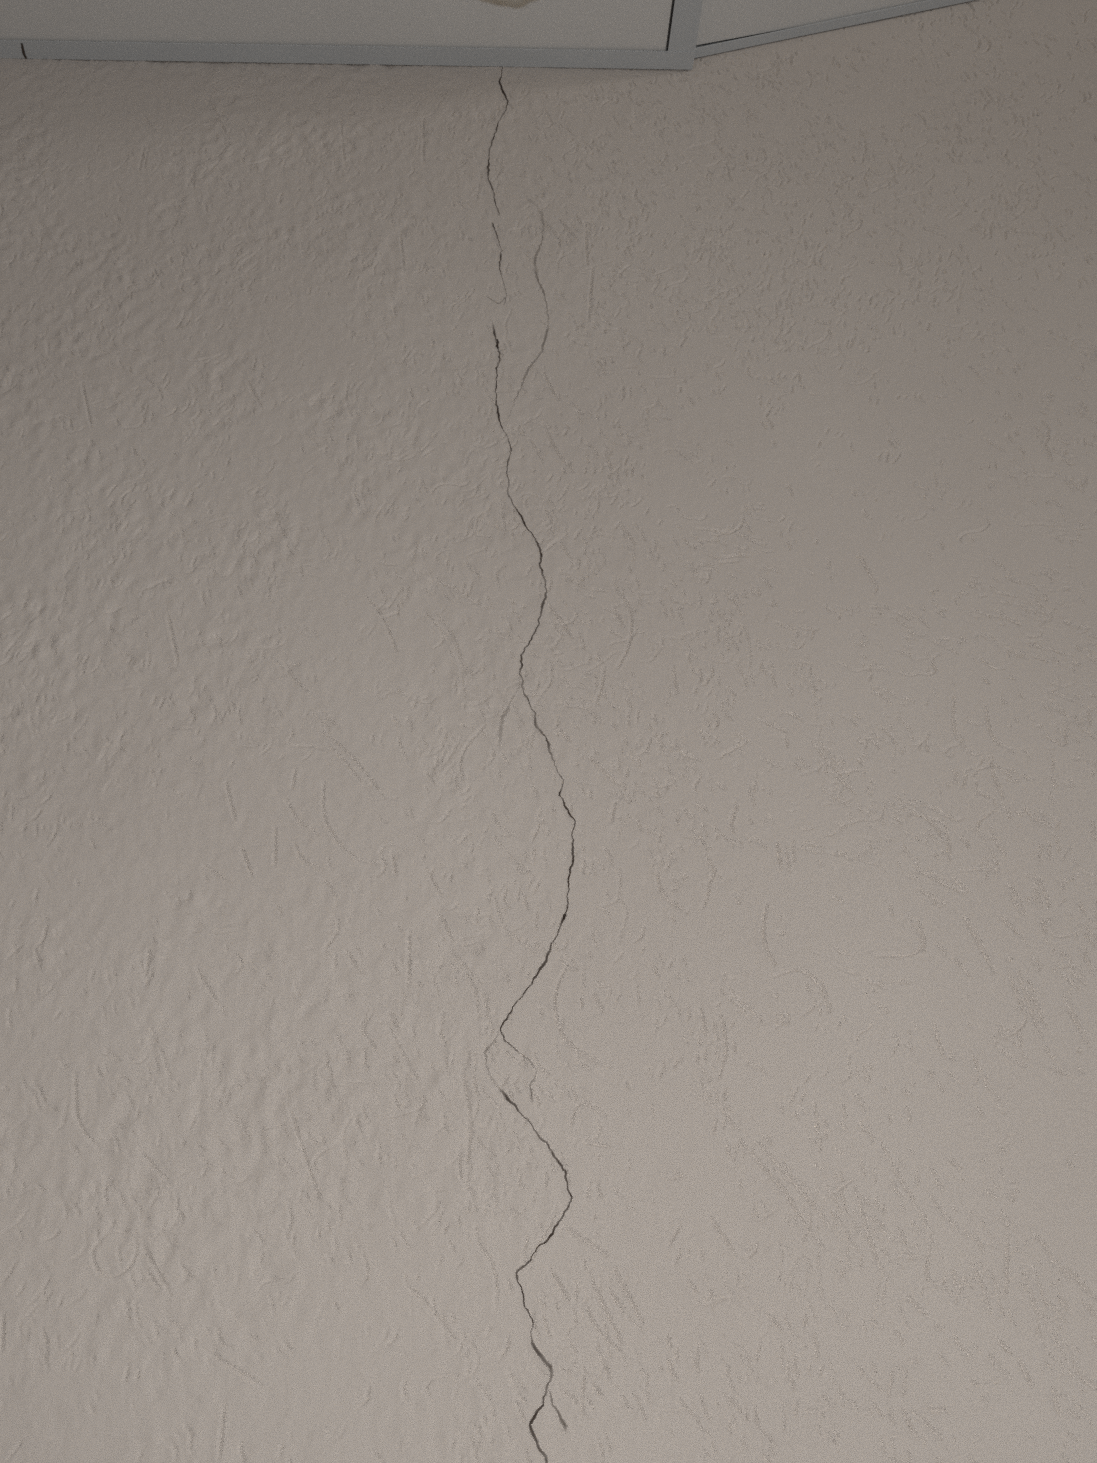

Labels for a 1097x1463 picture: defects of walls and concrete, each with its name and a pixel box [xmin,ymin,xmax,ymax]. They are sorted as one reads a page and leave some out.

crack [487,66,508,276]
crack [493,330,576,1048]
crack [503,1092,573,1463]